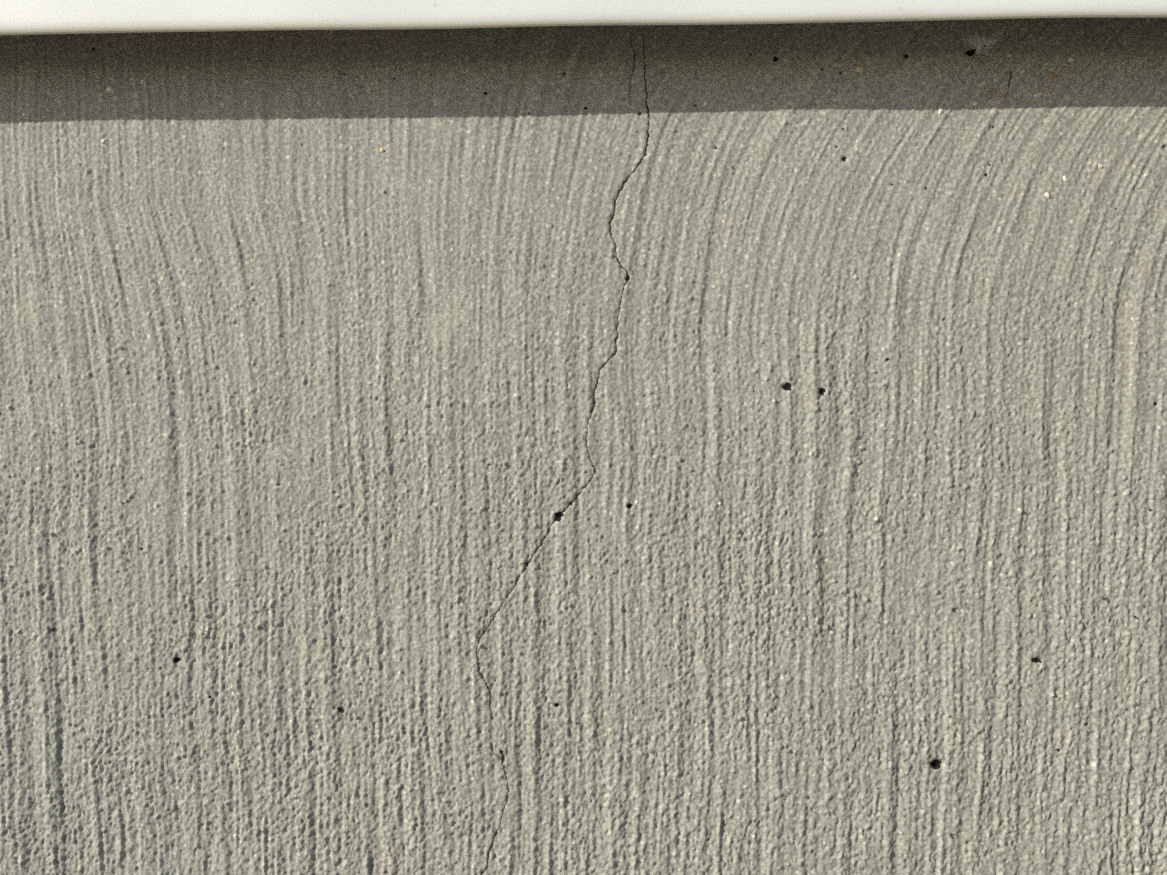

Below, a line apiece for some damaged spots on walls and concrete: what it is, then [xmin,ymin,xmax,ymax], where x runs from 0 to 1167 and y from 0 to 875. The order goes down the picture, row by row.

crack [475,29,650,875]